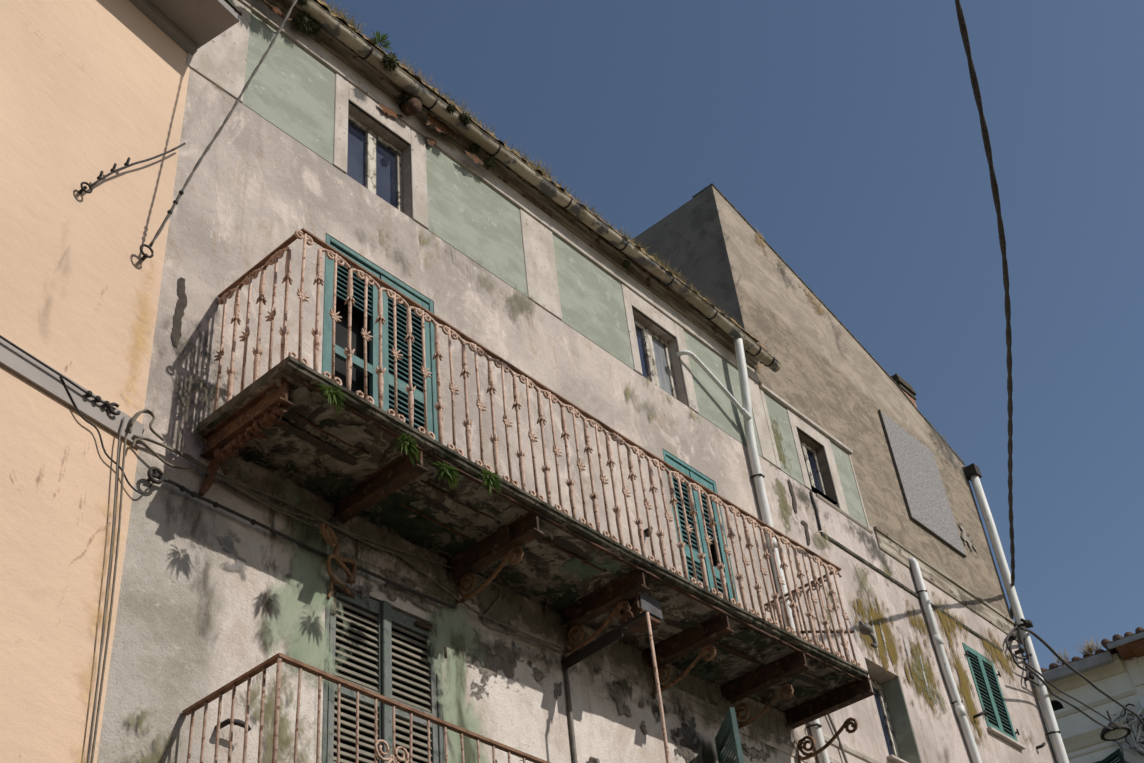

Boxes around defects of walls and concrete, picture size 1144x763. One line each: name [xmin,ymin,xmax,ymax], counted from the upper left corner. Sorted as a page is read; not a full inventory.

peeling [266,379,387,452]
leakage [257,595,273,651]
peeling [241,442,562,763]
flaking render [611,688,702,763]